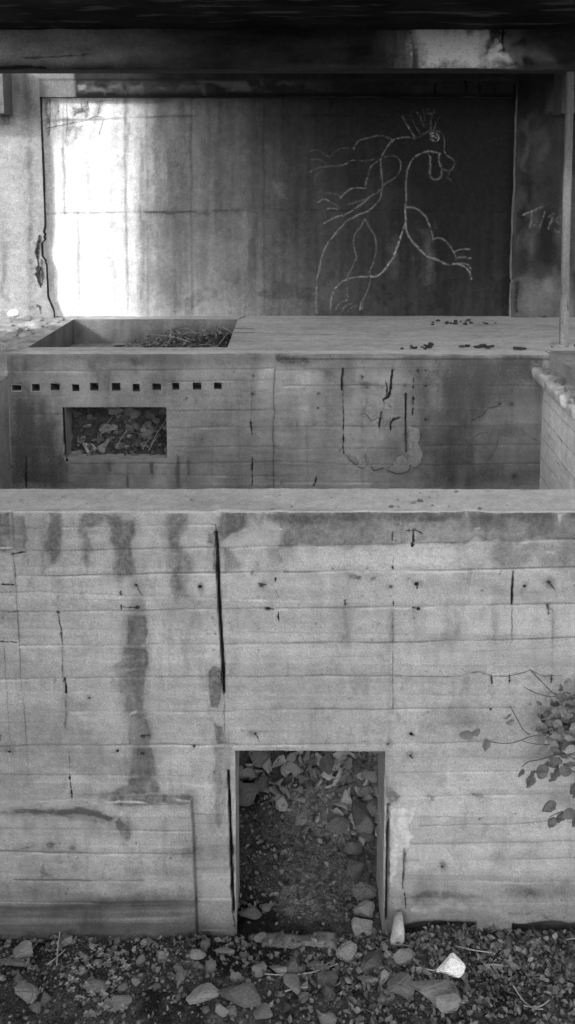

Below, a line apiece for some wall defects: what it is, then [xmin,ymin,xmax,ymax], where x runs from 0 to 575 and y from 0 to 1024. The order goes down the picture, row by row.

crack [338,368,346,454]
flaking render [347,426,423,474]
crack [378,371,421,468]
leakage [47,517,61,560]
leakage [82,516,135,574]
leakage [126,616,148,685]
crack [215,525,225,726]
leakage [112,759,190,806]
leakage [15,807,128,838]
crack [227,770,236,927]